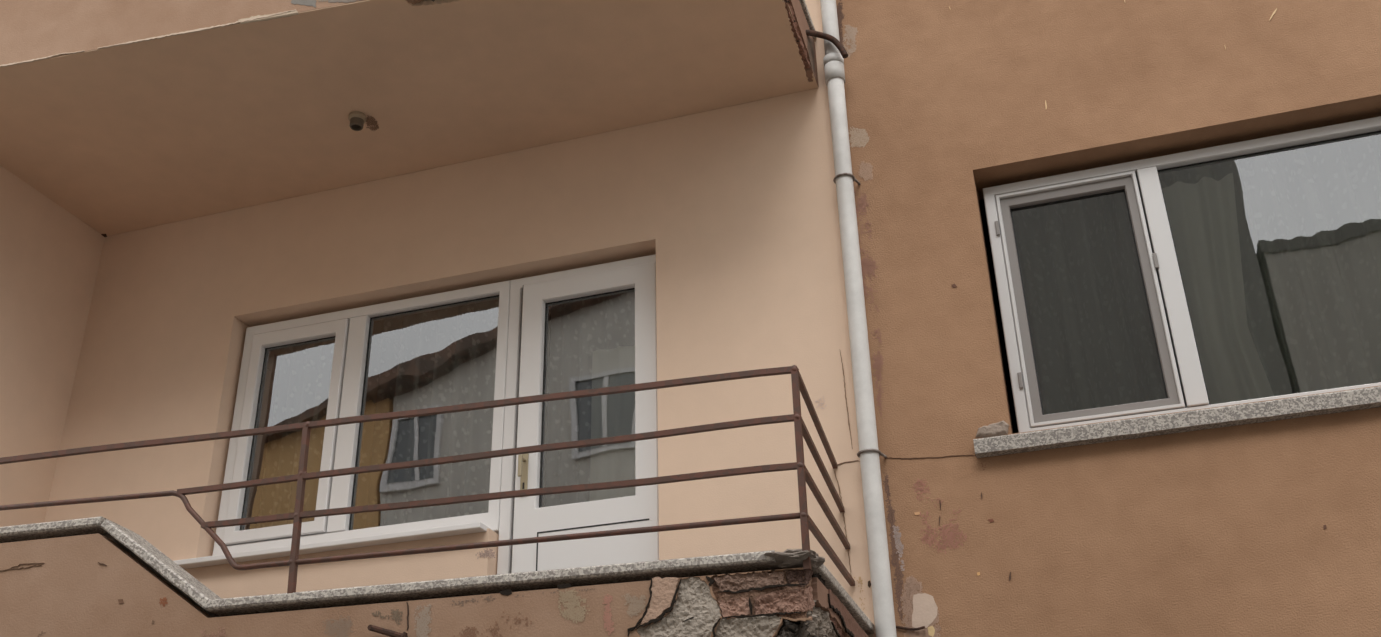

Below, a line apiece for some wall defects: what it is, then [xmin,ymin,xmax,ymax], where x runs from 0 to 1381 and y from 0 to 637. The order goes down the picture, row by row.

flaking render [784,0,811,69]
crack [627,352,976,637]
flaking render [621,577,679,625]
flaking render [712,570,868,637]
peeling [892,525,941,637]